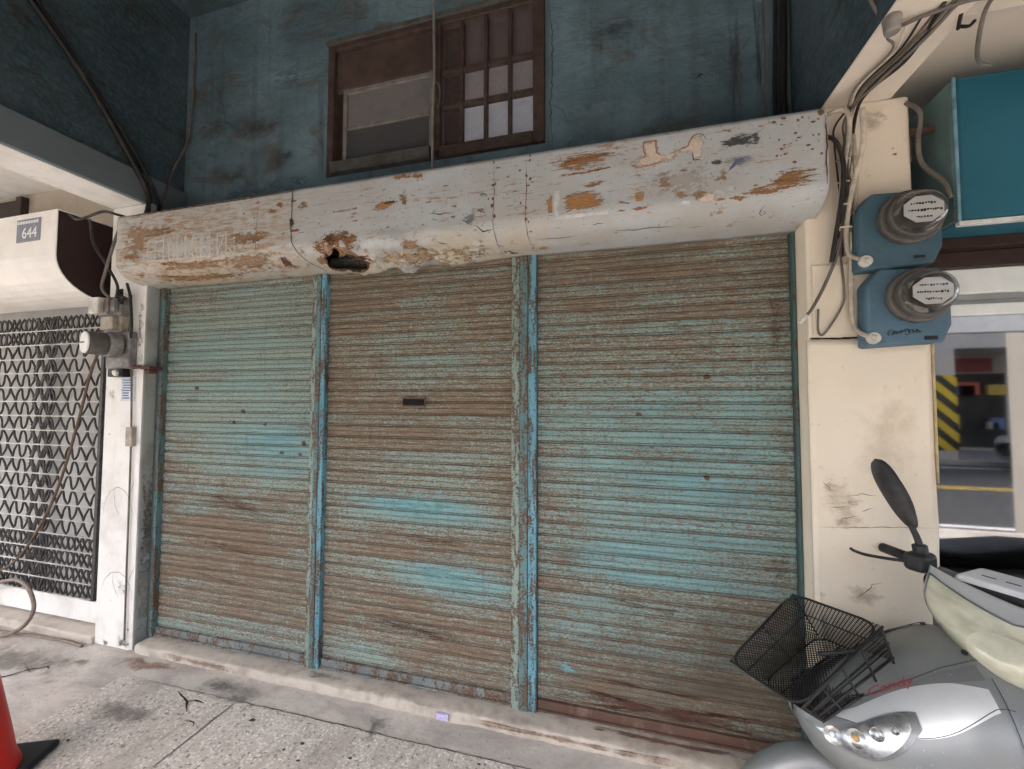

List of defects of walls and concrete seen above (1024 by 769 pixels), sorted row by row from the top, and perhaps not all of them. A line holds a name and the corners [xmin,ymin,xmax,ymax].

peeling [317,244,348,265]
crack [823,482,907,528]
corrosion [588,694,747,731]
corrosion [618,731,724,754]